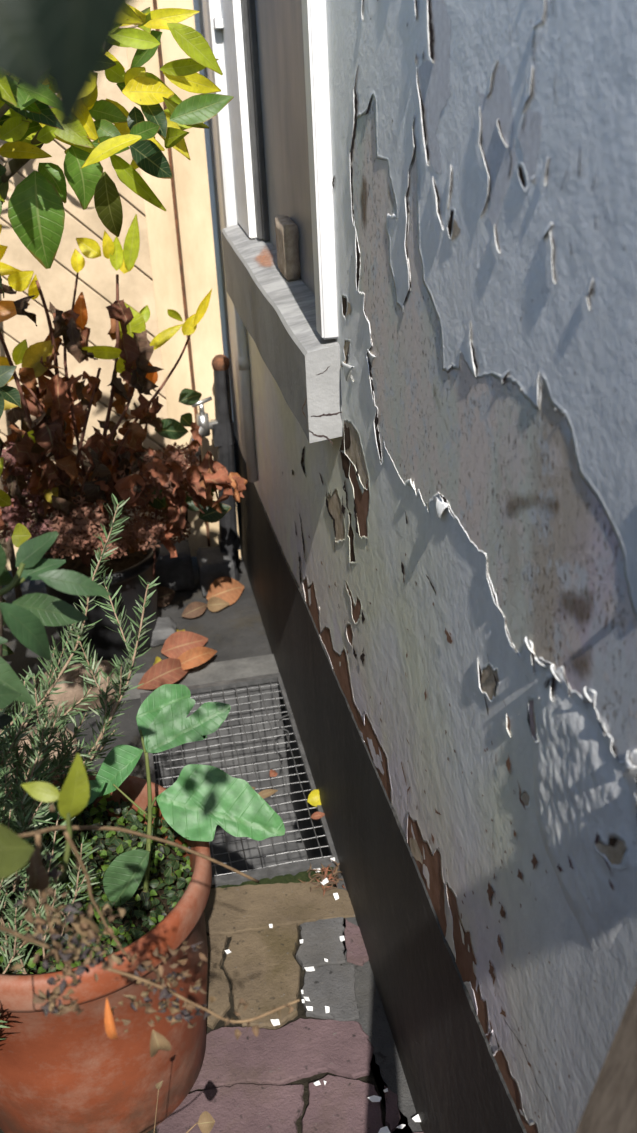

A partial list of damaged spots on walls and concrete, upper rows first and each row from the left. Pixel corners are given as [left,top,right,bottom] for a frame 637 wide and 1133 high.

crack [496,0,596,229]
crack [425,144,452,229]
crack [492,224,500,254]
crack [542,222,571,283]
crack [585,277,593,310]
peeling [319,0,637,822]
peeling [293,509,539,1133]
peeling [593,827,631,890]